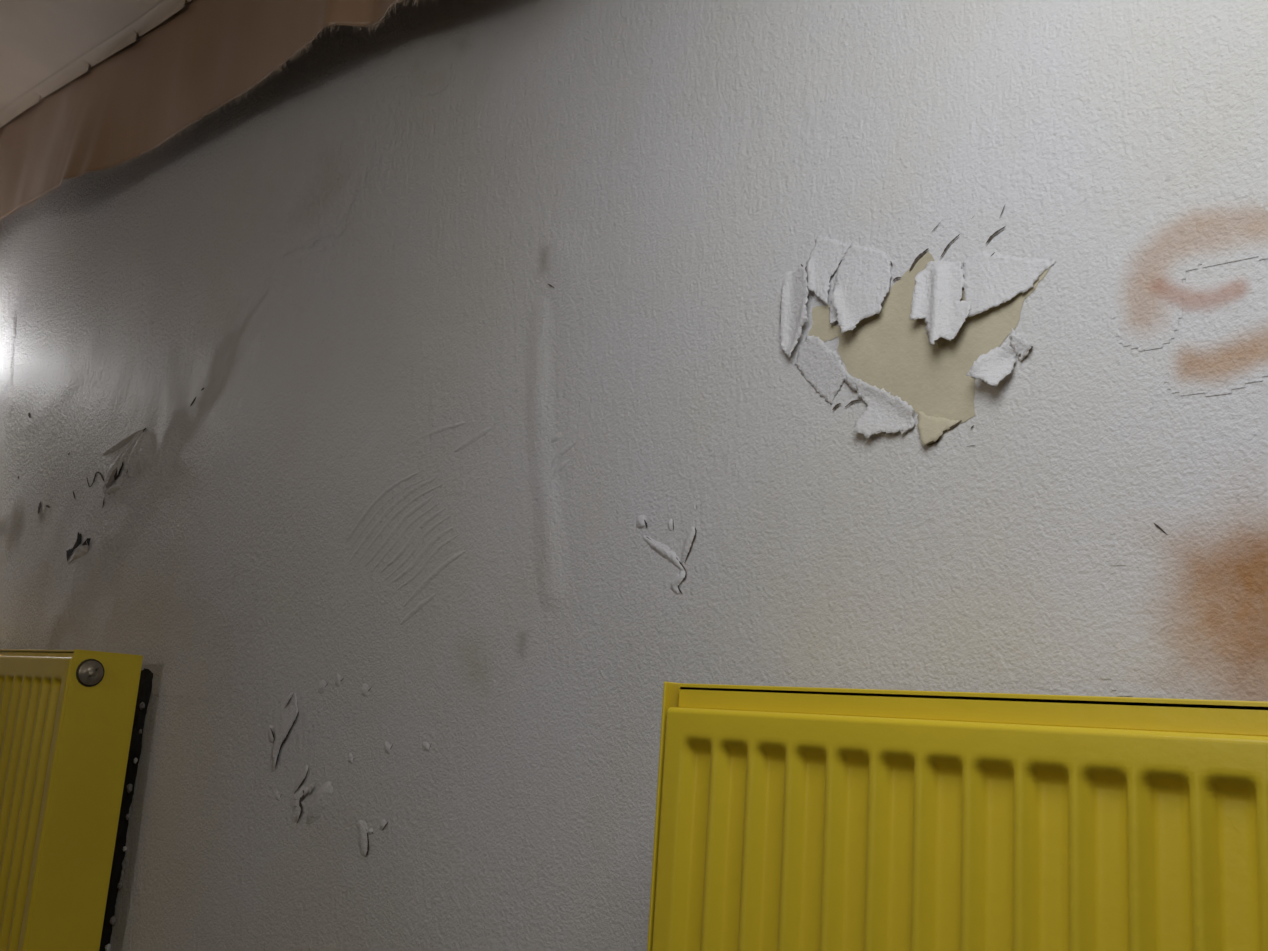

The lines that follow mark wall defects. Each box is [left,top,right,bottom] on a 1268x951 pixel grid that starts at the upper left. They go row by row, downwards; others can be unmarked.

peeling [779,205,1056,446]
corrosion [1111,190,1268,397]
peeling [66,532,91,564]
peeling [87,428,152,509]
corrosion [1100,429,1268,702]